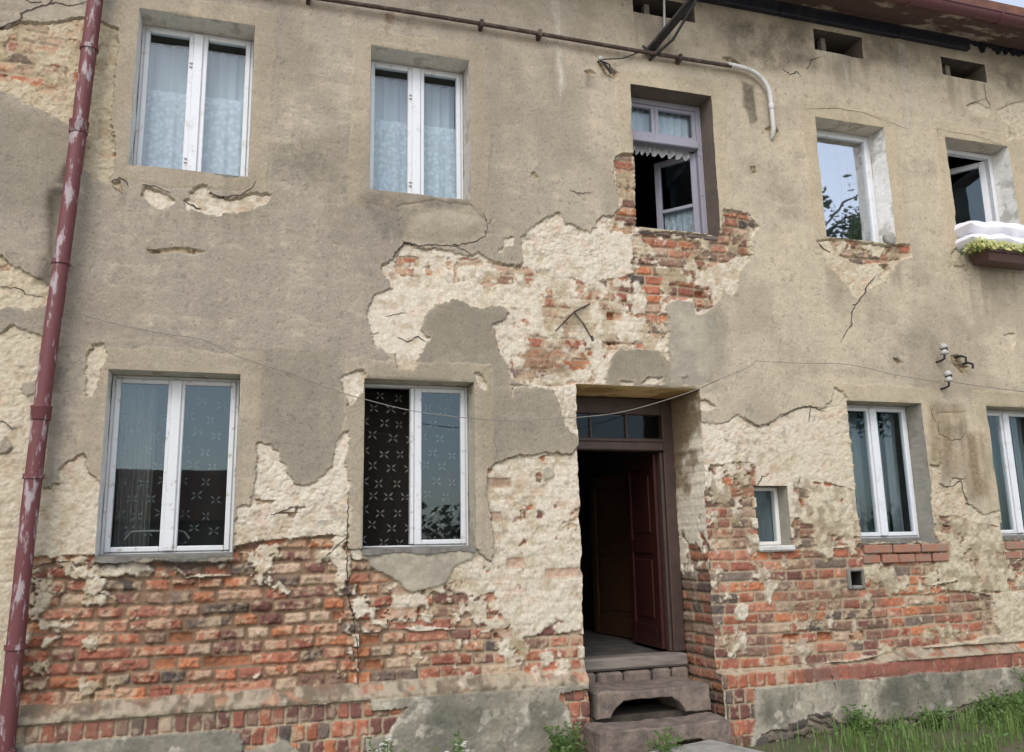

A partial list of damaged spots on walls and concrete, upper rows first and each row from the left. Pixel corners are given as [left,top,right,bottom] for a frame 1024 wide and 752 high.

peeling [0,16,85,123]
peeling [83,22,123,192]
peeling [0,254,49,310]
crack [841,276,876,341]
peeling [816,237,912,299]
peeling [0,324,42,698]
crack [323,497,359,685]
peeling [18,152,760,752]
crack [745,405,825,426]
peeling [700,387,1024,747]